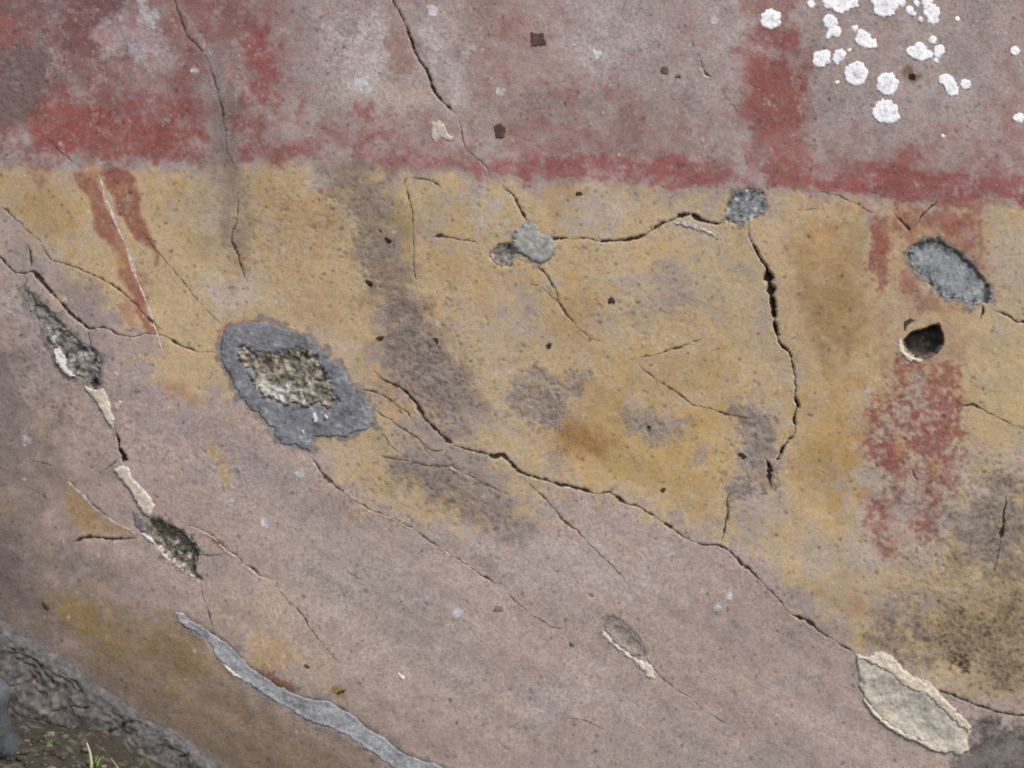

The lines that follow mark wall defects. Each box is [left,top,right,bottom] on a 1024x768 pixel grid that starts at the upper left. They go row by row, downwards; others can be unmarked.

crack [390,0,529,222]
crack [0,206,220,355]
spalling [489,243,514,267]
crack [553,213,726,242]
spalling [18,284,105,390]
crack [749,235,799,488]
spalling [897,318,923,363]
crack [107,428,128,468]
spalling [132,511,201,579]
crack [363,371,856,655]
spalling [601,616,655,680]
crack [940,690,1024,728]